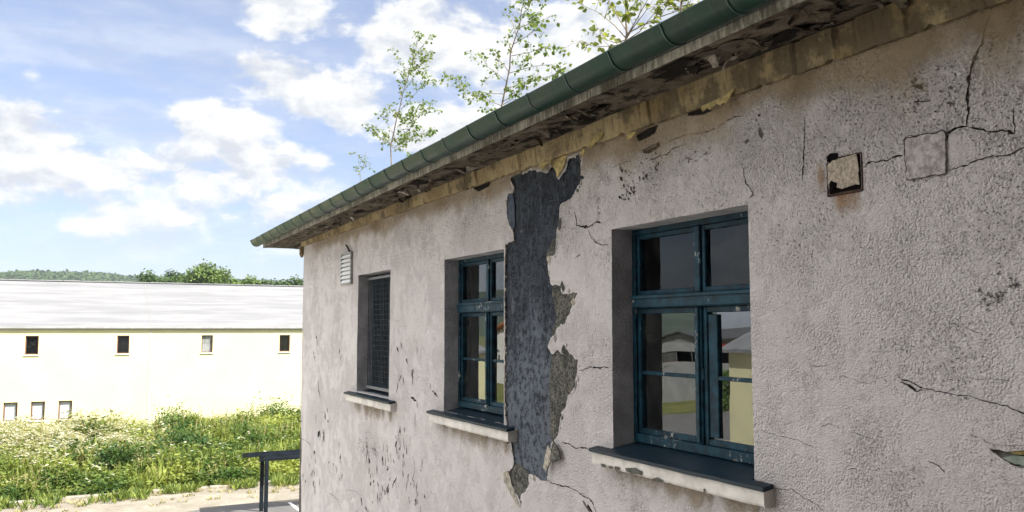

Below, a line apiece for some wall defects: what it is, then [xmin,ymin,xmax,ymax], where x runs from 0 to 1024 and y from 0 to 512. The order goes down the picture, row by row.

crack [863,19,1024,181]
spalling [619,125,662,204]
crack [798,119,806,180]
peeling [293,167,477,241]
crack [573,207,608,257]
peeling [503,149,586,507]
crack [916,376,1024,414]
spalling [299,411,329,512]
peeling [358,427,425,512]
crack [547,481,596,512]
crack [561,442,589,451]
spalling [976,436,1024,468]